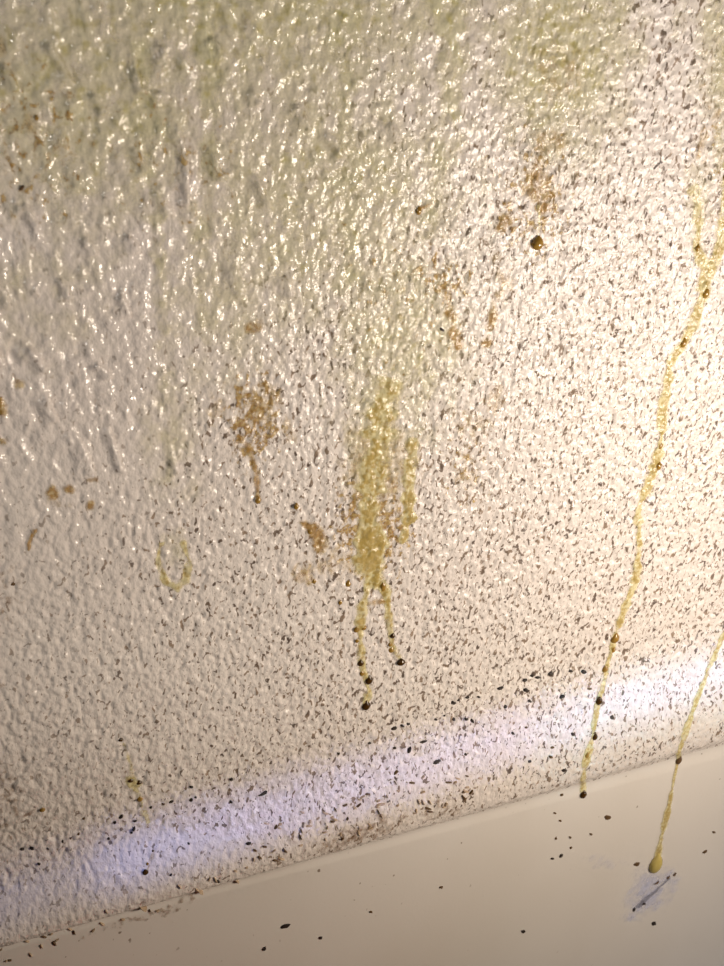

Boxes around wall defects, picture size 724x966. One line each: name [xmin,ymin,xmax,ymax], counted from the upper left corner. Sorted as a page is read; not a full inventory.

damp [0,0,389,189]
damp [269,105,396,253]
damp [401,0,464,68]
damp [496,0,626,265]
damp [481,306,497,347]
damp [330,244,473,711]
damp [580,123,724,799]
damp [649,632,724,873]